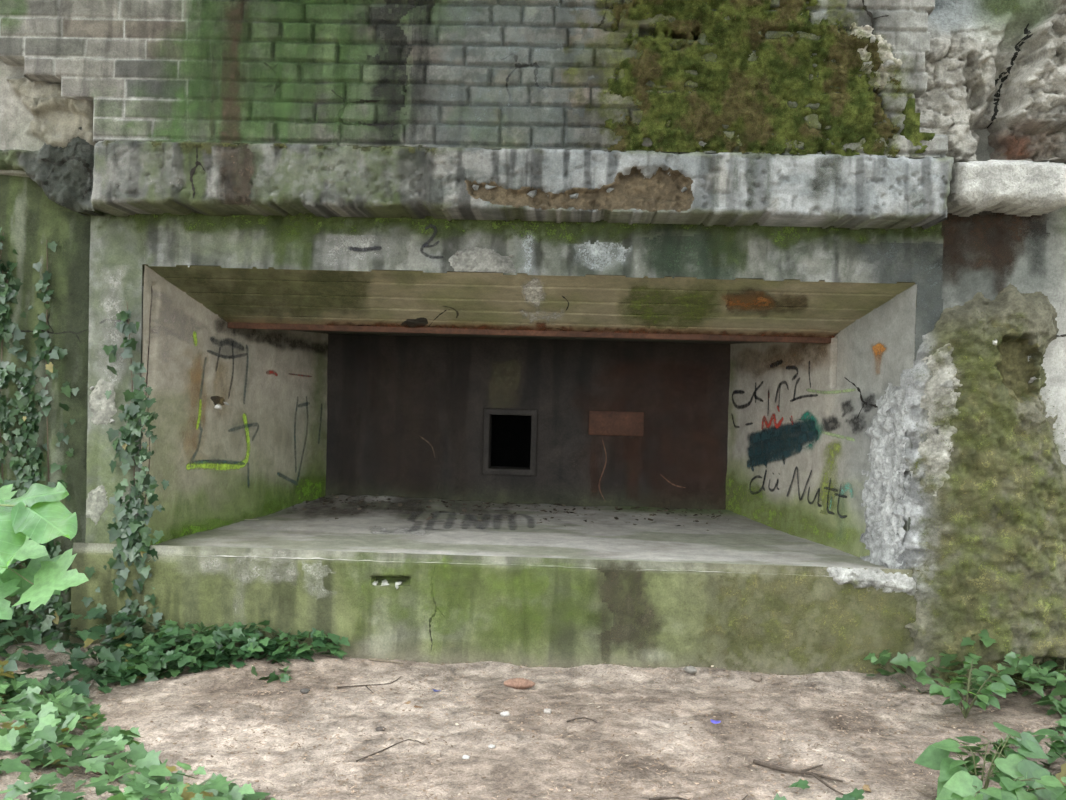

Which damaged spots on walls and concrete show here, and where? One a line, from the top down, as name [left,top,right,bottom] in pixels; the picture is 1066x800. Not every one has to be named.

spalling [850,22,902,92]
spalling [915,0,1066,164]
crack [984,23,1033,129]
spalling [465,166,694,212]
crack [12,313,130,340]
rust [327,322,837,338]
rust [724,289,807,314]
spalling [827,343,963,596]
spalling [369,575,411,589]
crack [429,566,445,650]